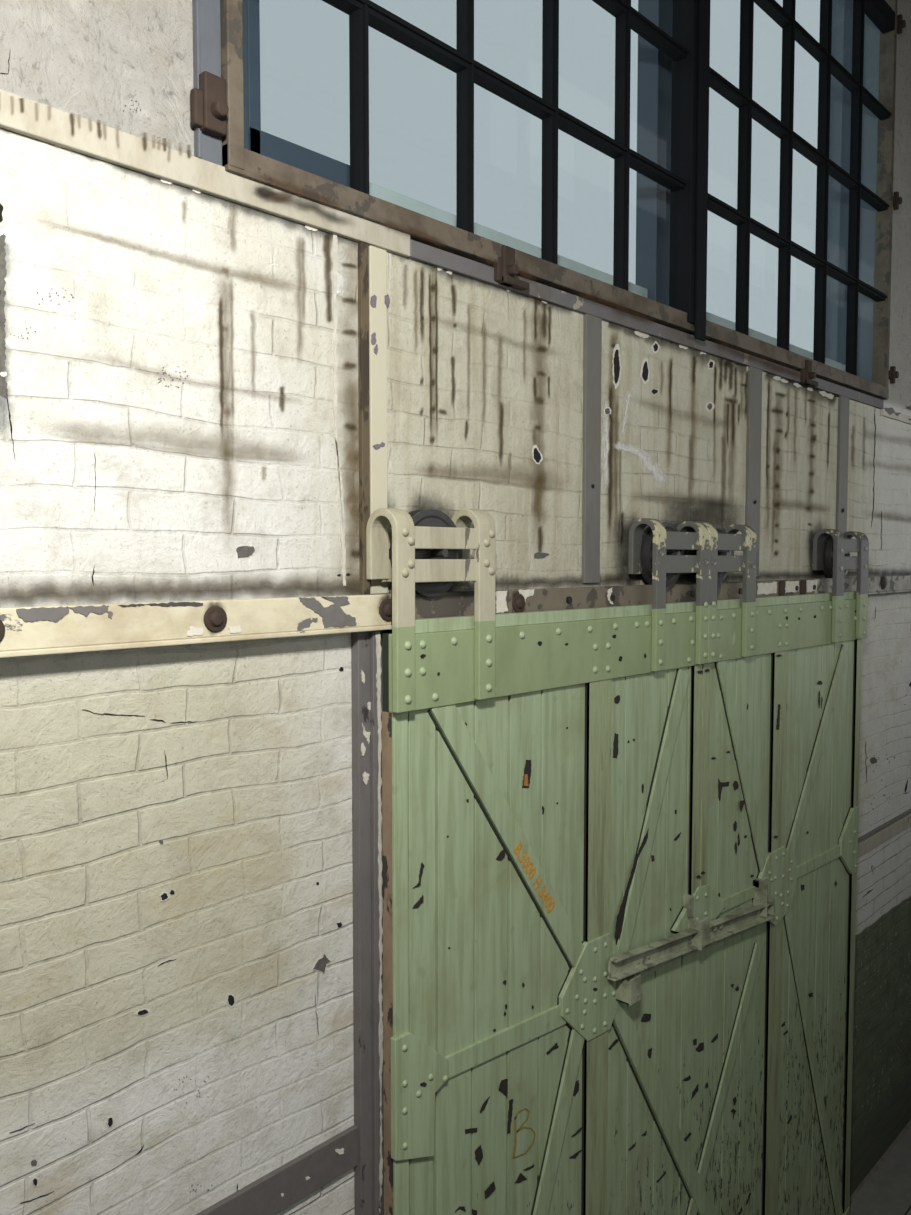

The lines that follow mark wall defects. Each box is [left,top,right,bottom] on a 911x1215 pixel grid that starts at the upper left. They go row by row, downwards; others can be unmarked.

leakage [324,234,355,321]
peeling [112,163,357,628]
leakage [766,385,788,488]
peeling [16,602,203,622]
peeling [187,626,203,636]